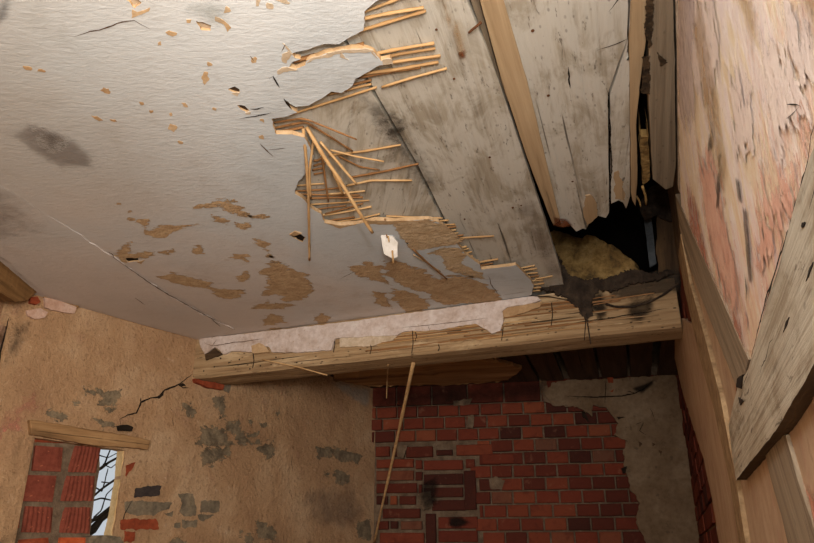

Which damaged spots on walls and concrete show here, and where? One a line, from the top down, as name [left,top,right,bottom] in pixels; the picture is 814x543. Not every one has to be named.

crack [74,20,145,37]
flaking render [131,0,150,18]
flaking render [186,6,231,32]
flaking render [307,48,393,65]
peeling [127,210,198,238]
peeling [193,197,270,230]
peeling [114,241,176,264]
peeling [349,218,501,313]
peeling [157,238,314,330]
flaking render [72,384,133,431]
crack [120,376,190,424]
flaking render [194,385,276,468]